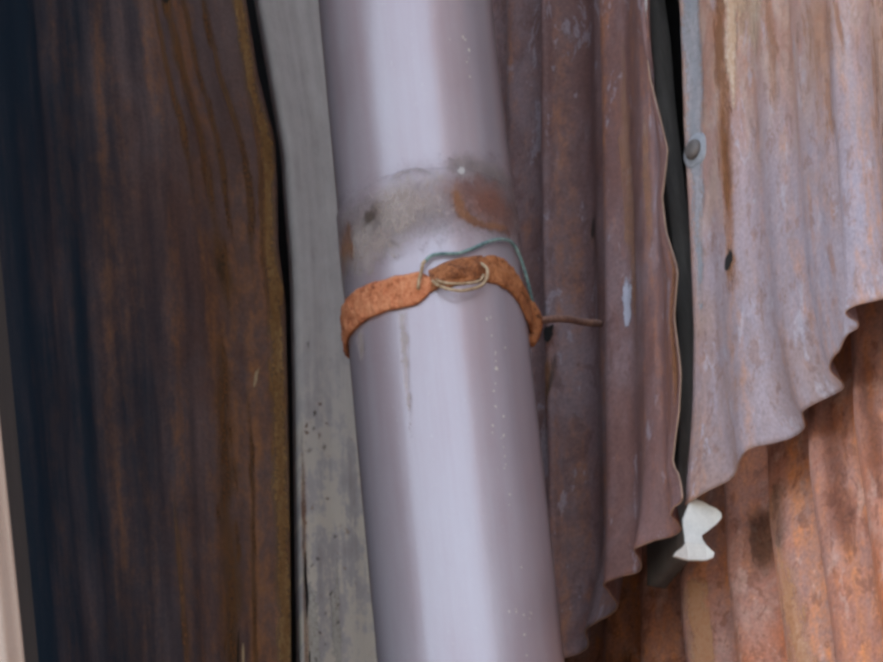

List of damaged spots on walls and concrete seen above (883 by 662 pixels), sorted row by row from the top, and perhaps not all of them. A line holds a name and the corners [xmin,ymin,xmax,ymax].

rust [712,0,732,229]
rust [797,0,843,142]
rust [686,578,715,662]